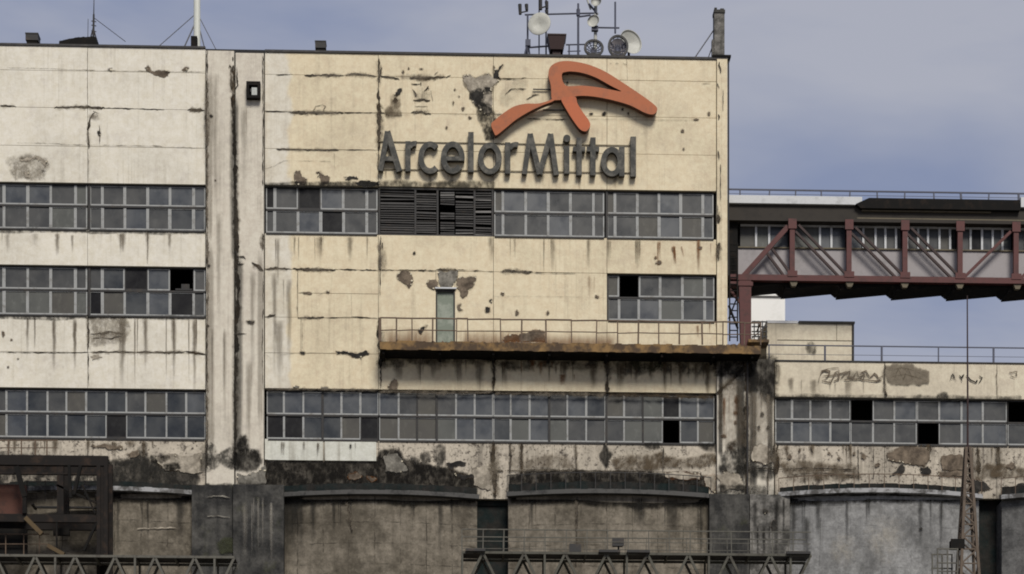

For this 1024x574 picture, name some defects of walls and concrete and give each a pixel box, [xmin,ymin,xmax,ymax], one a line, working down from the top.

spalling [453,64,503,119]
peeling [20,156,48,178]
spalling [397,270,477,311]
water stain [0,314,147,358]
water stain [159,315,206,360]
water stain [128,441,180,471]
water stain [201,435,262,471]
spalling [446,461,492,490]
water stain [716,374,773,514]
spalling [853,446,963,477]
water stain [757,500,819,548]